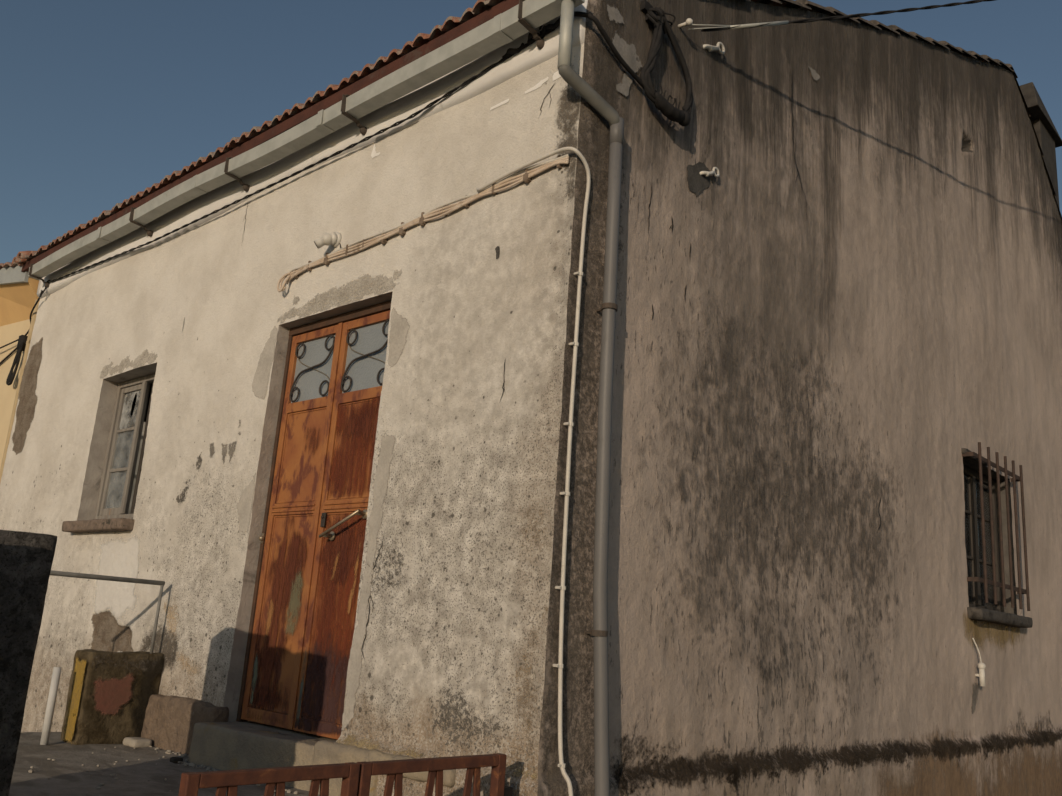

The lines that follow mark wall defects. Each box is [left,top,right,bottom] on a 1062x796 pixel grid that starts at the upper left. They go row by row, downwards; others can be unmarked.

leakage [596,0,1062,257]
flaking render [12,337,43,455]
crack [361,537,384,658]
flaking render [63,611,134,741]